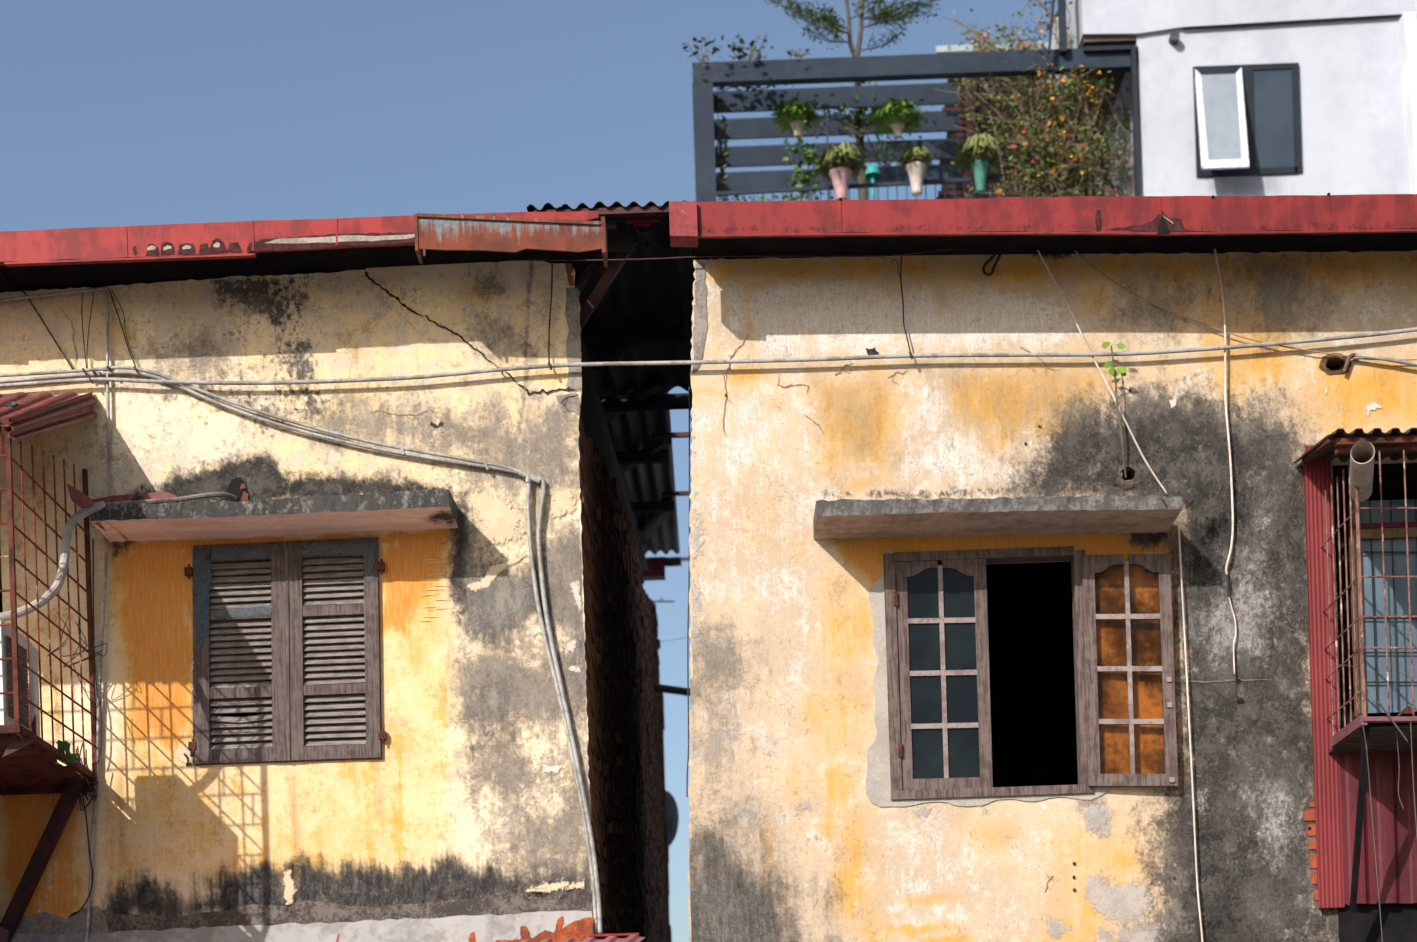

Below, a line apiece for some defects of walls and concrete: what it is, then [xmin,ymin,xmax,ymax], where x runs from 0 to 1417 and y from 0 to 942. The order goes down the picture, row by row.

rust [133,232,415,256]
rust [1081,209,1203,232]
leakage [153,275,580,483]
crack [370,410,434,419]
crack [365,271,581,411]
peeling [467,489,532,592]
leakage [134,454,586,795]
leakage [870,382,1346,942]
leakage [108,790,591,917]
leakage [689,818,792,942]
peeling [1082,801,1113,837]
peeling [1084,874,1161,942]